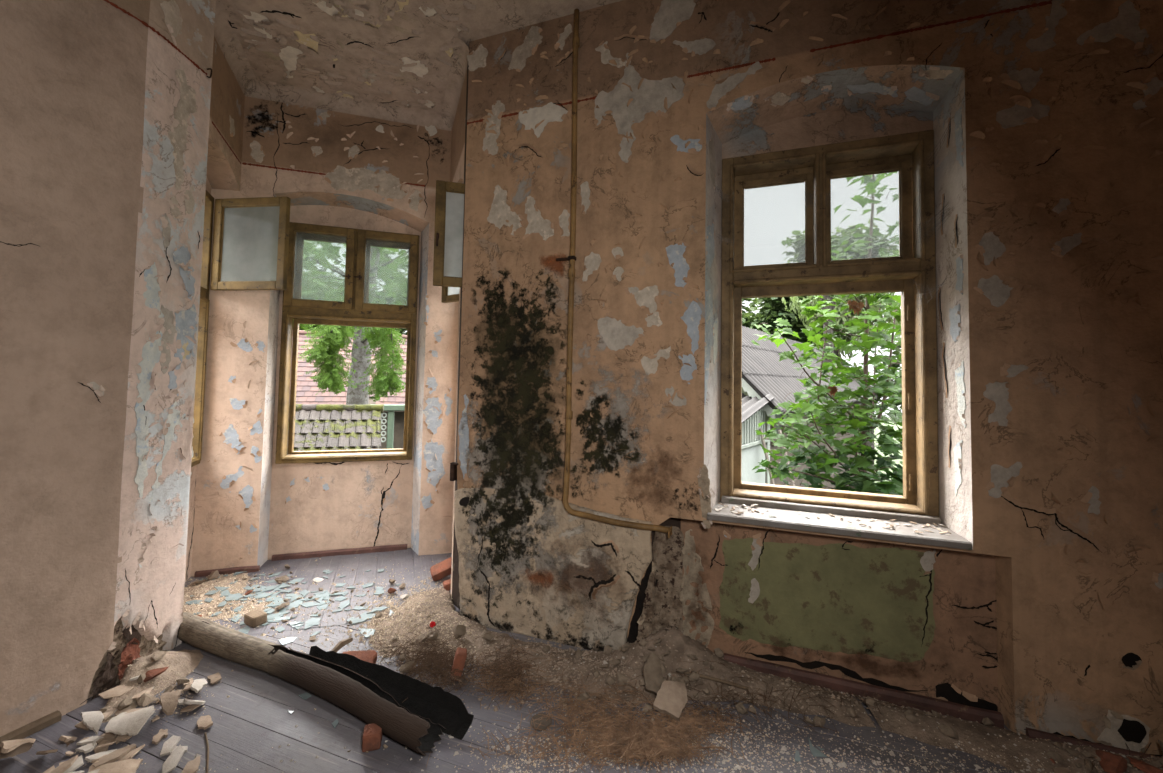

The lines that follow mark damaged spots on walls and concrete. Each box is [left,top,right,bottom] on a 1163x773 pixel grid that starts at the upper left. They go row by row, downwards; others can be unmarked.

peeling [508,24,572,72]
peeling [649,0,716,57]
peeling [518,102,568,138]
peeling [487,181,590,241]
peeling [134,65,198,503]
peeling [641,241,718,409]
peeling [212,398,263,533]
crack [374,462,408,546]
peeling [421,377,470,511]
damp [462,270,707,629]
crack [574,540,642,600]
spalling [90,609,174,700]